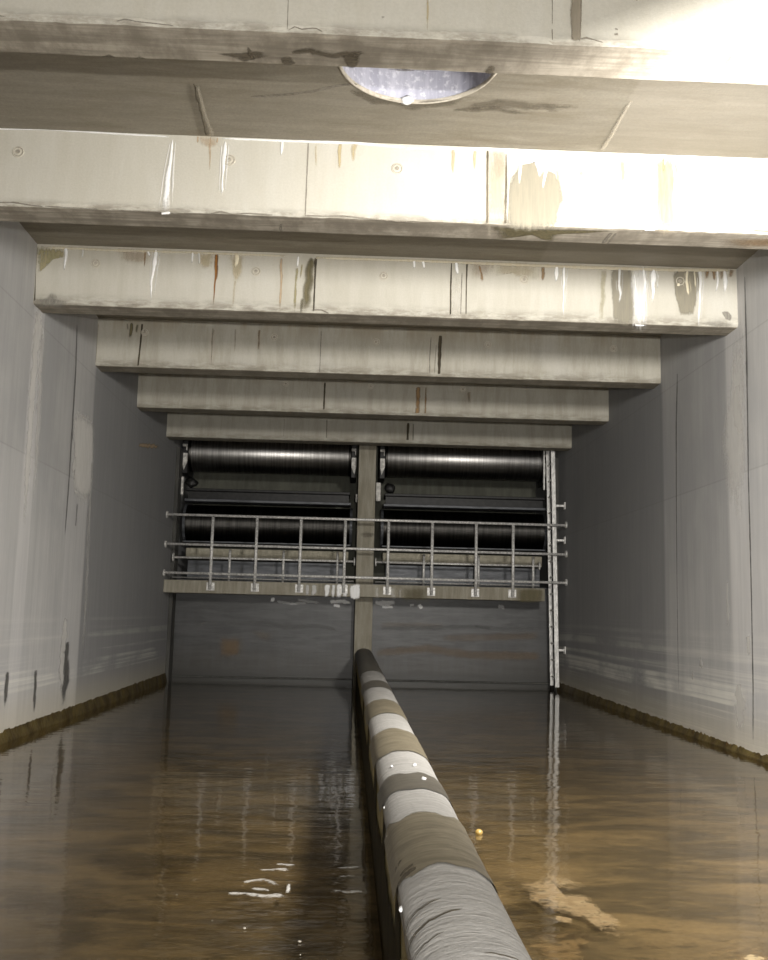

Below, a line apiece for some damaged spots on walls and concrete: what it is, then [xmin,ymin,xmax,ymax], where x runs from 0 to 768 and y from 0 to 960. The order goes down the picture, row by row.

rust [570,0,582,40]
damp [222,48,262,61]
damp [219,138,766,233]
damp [48,246,280,292]
damp [297,256,728,326]